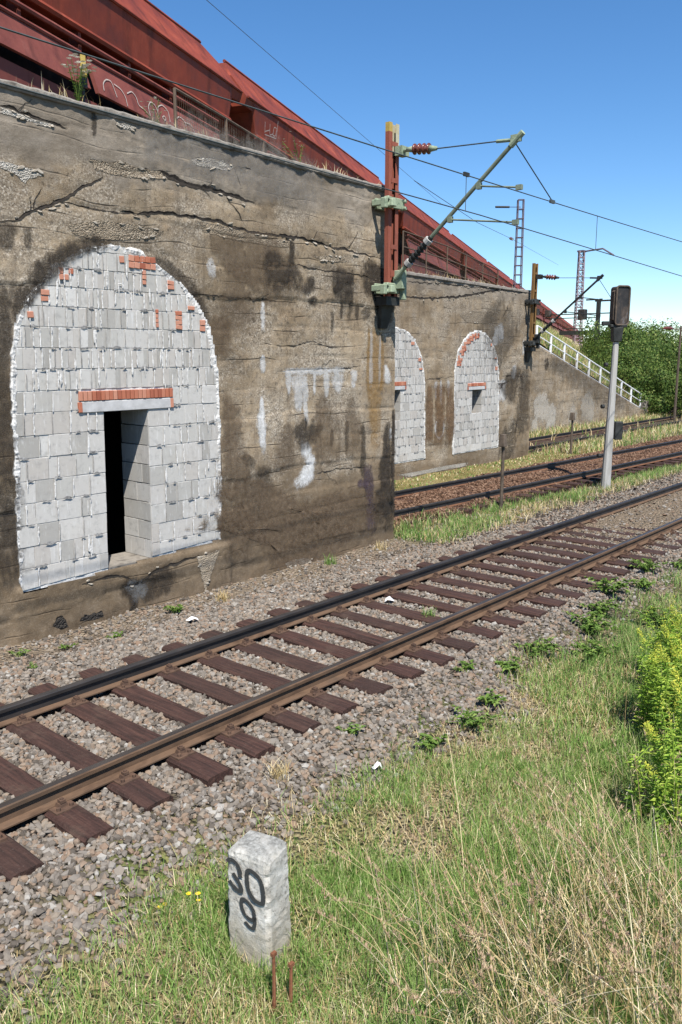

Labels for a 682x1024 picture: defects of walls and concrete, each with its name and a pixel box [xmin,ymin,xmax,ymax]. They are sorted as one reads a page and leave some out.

spalling [0,108,55,127]
spalling [0,161,44,183]
spalling [89,159,167,181]
spalling [191,157,233,170]
crack [0,157,377,280]
water stain [212,235,317,355]
water stain [331,261,384,329]
water stain [499,366,529,460]
water stain [218,368,396,570]
water stain [120,567,175,610]